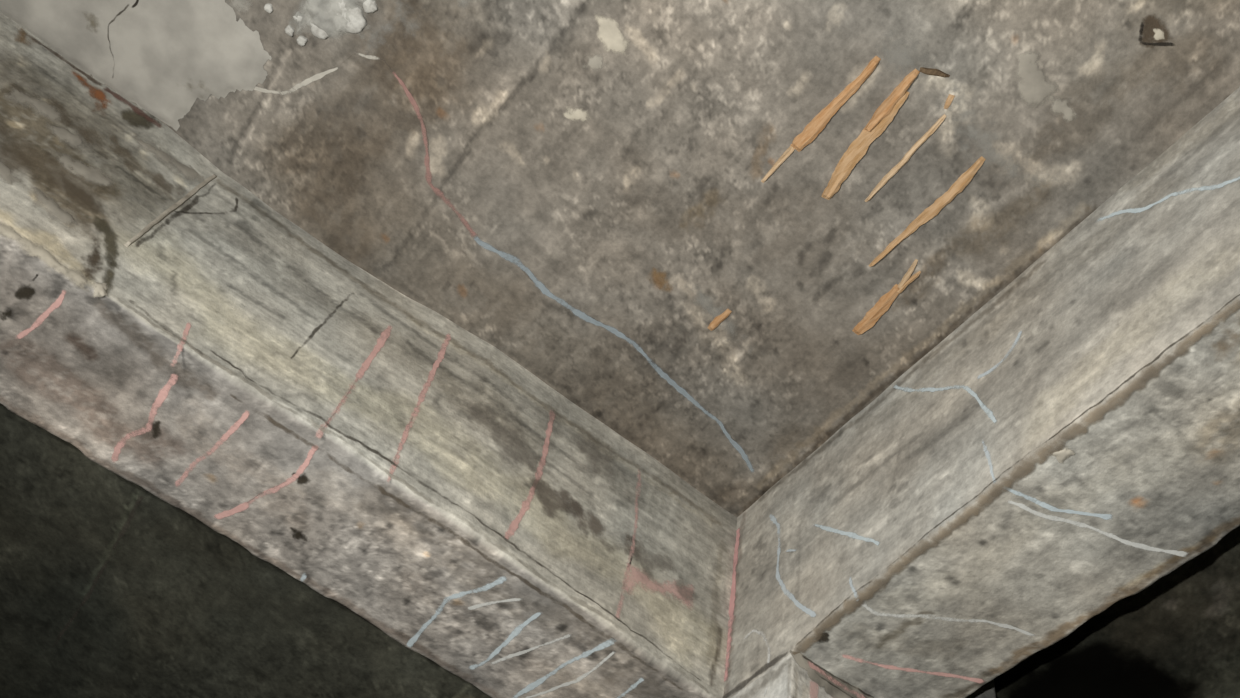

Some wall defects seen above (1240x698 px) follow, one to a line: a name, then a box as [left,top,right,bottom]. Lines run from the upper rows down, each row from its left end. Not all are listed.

crack [107,0,138,43]
damp [231,0,273,13]
damp [285,0,378,46]
spalling [1139,16,1174,47]
corrosion [19,33,160,127]
crack [254,53,754,479]
crack [215,326,391,519]